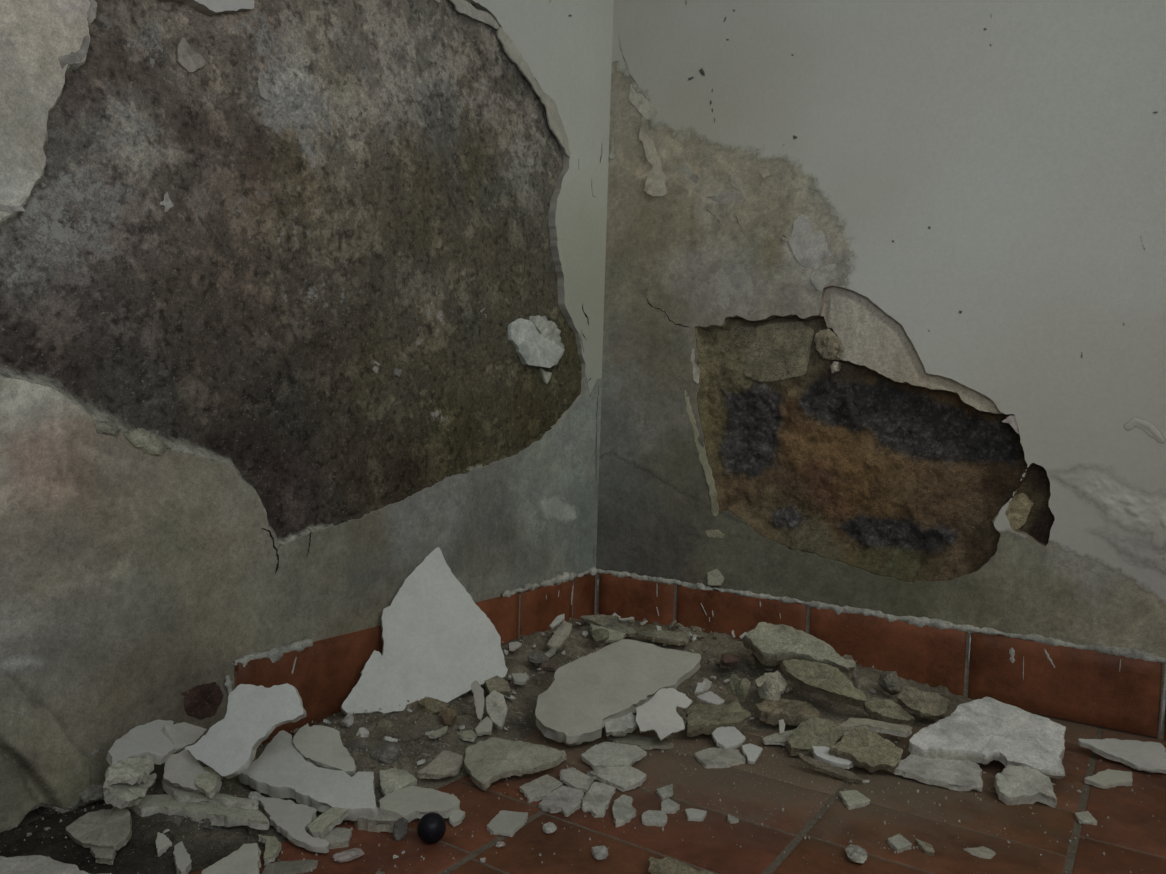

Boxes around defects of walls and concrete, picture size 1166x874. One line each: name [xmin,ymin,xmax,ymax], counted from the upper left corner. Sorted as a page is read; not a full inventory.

spalling [599,61,1055,583]
spalling [0,0,602,785]
spalling [695,682,725,705]
spalling [604,712,674,750]
spalling [694,730,793,768]
spalling [812,746,854,769]
peeling [0,753,56,832]
spalling [379,768,417,796]
spalling [487,750,680,847]
spalling [155,832,172,857]
spalling [258,835,282,866]
spalling [887,834,912,853]